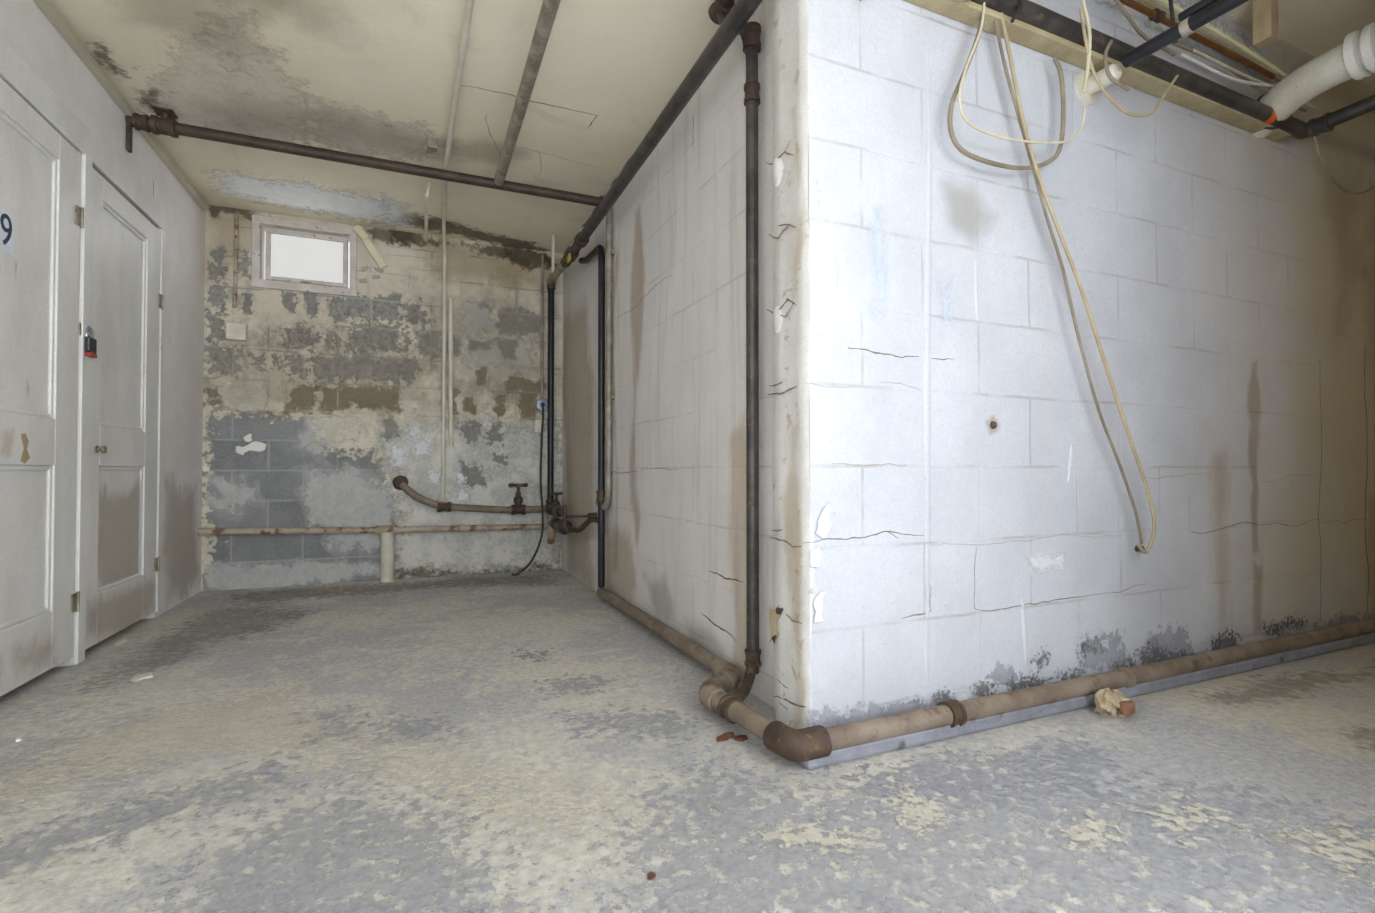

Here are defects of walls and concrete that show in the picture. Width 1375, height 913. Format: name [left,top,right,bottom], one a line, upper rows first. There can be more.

leakage [94,43,126,78]
leakage [140,89,160,109]
peeling [201,246,546,591]
leakage [1263,611,1373,637]
leakage [973,626,1242,697]